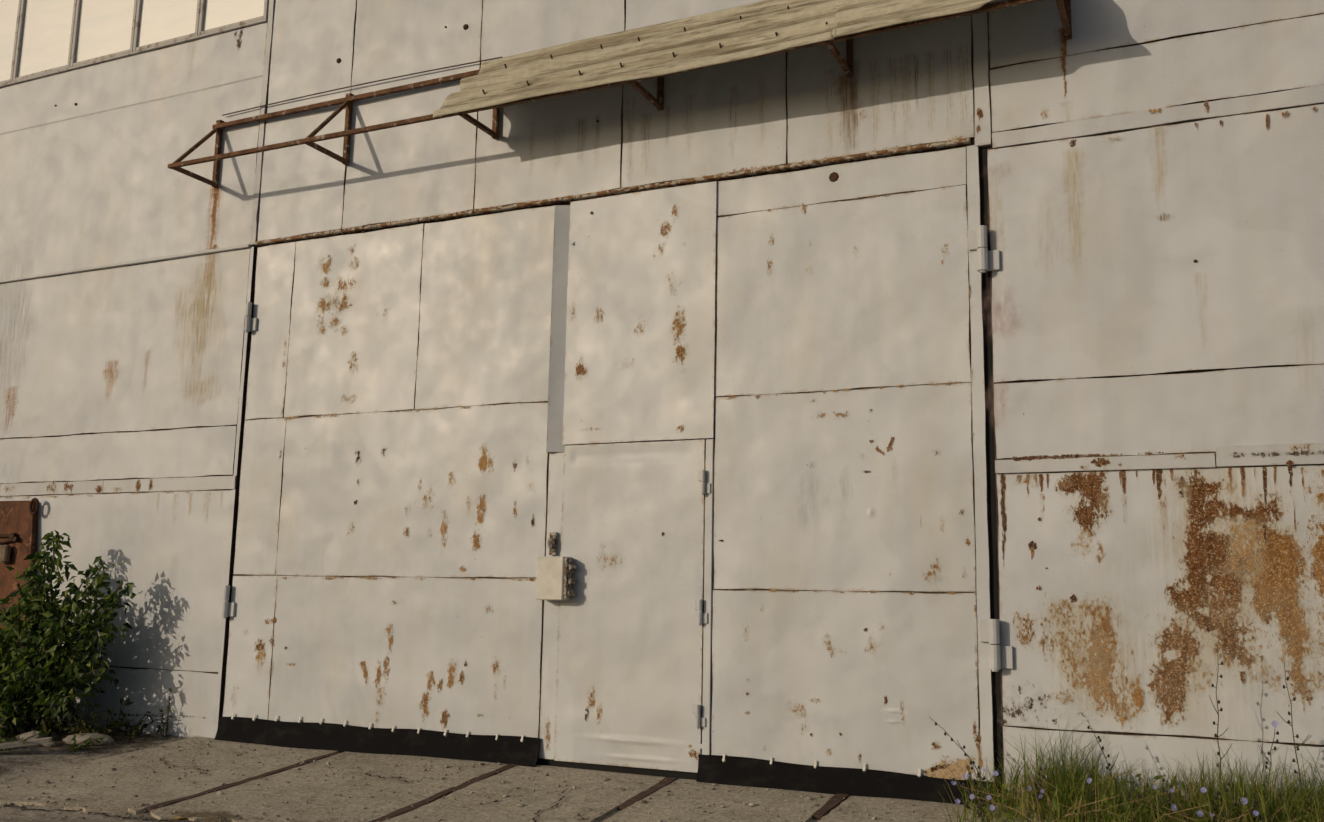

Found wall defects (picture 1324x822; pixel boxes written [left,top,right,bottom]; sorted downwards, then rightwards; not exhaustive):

corrosion [210,187,219,249]
corrosion [654,203,679,257]
corrosion [317,245,359,335]
corrosion [672,310,687,365]
corrosion [478,445,494,473]
corrosion [405,477,448,548]
corrosion [466,495,486,551]
corrosion [1000,445,1324,733]
corrosion [359,624,393,722]
corrosion [420,661,467,728]